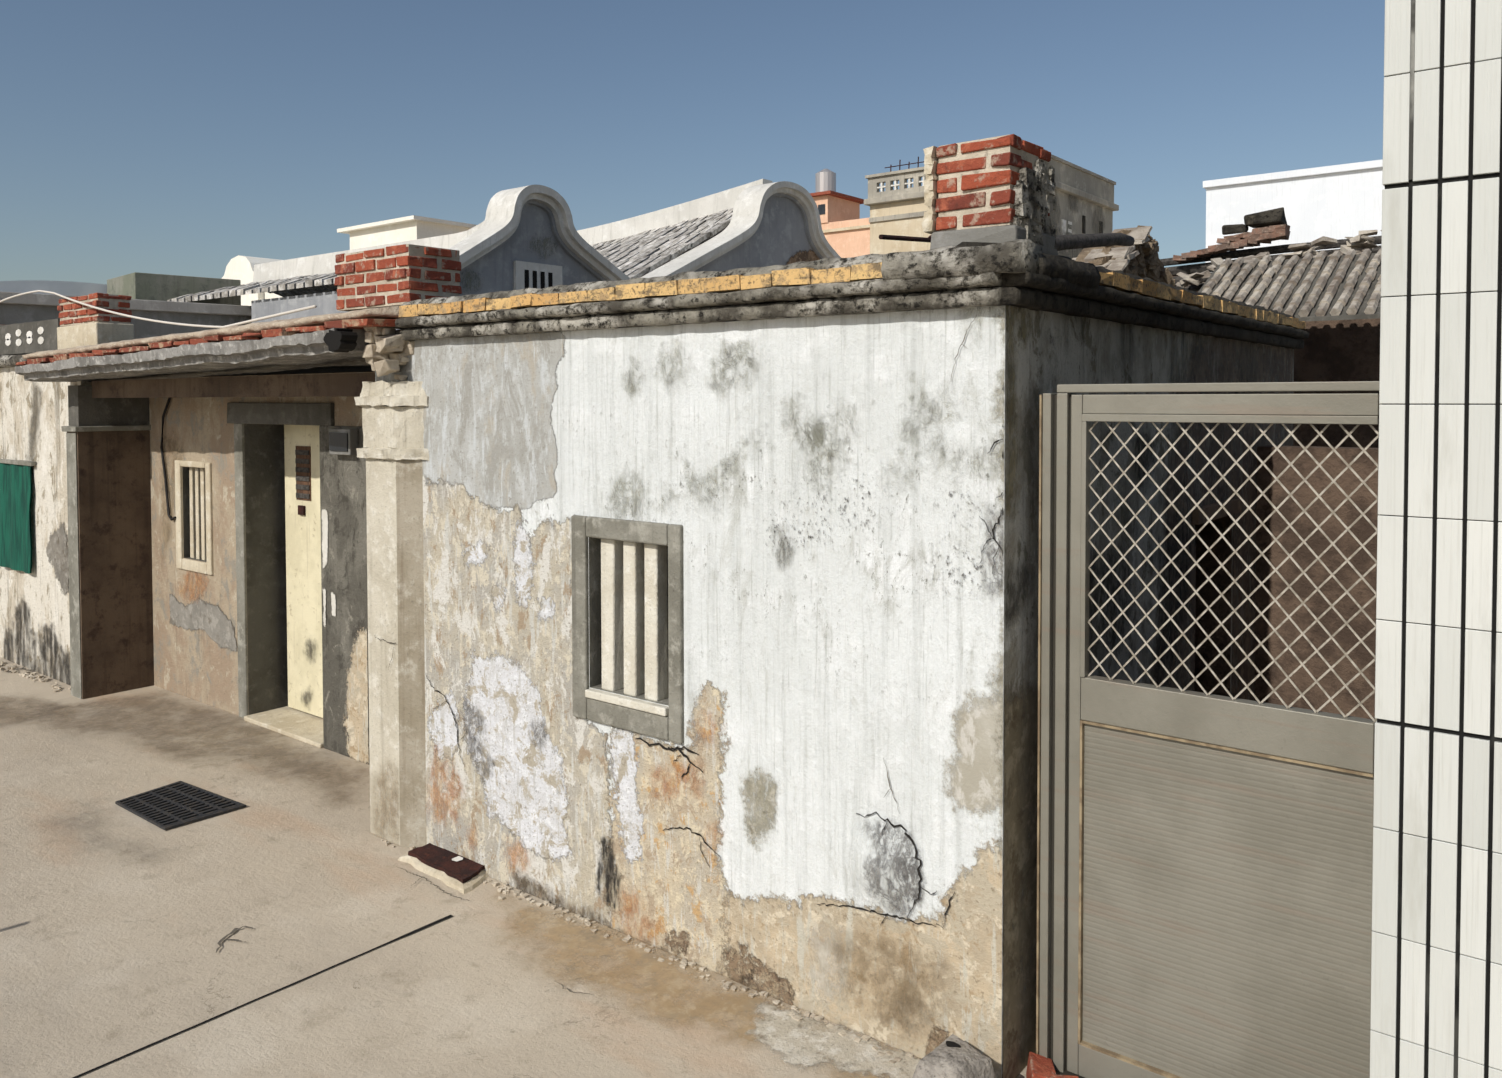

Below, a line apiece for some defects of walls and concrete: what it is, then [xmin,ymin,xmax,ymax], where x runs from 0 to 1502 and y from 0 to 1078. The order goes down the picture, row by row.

peeling [996,363,1005,591]
damp [3,601,71,685]
peeling [169,594,237,652]
crack [635,738,703,777]
peeling [376,332,1003,1078]
crack [817,758,955,929]